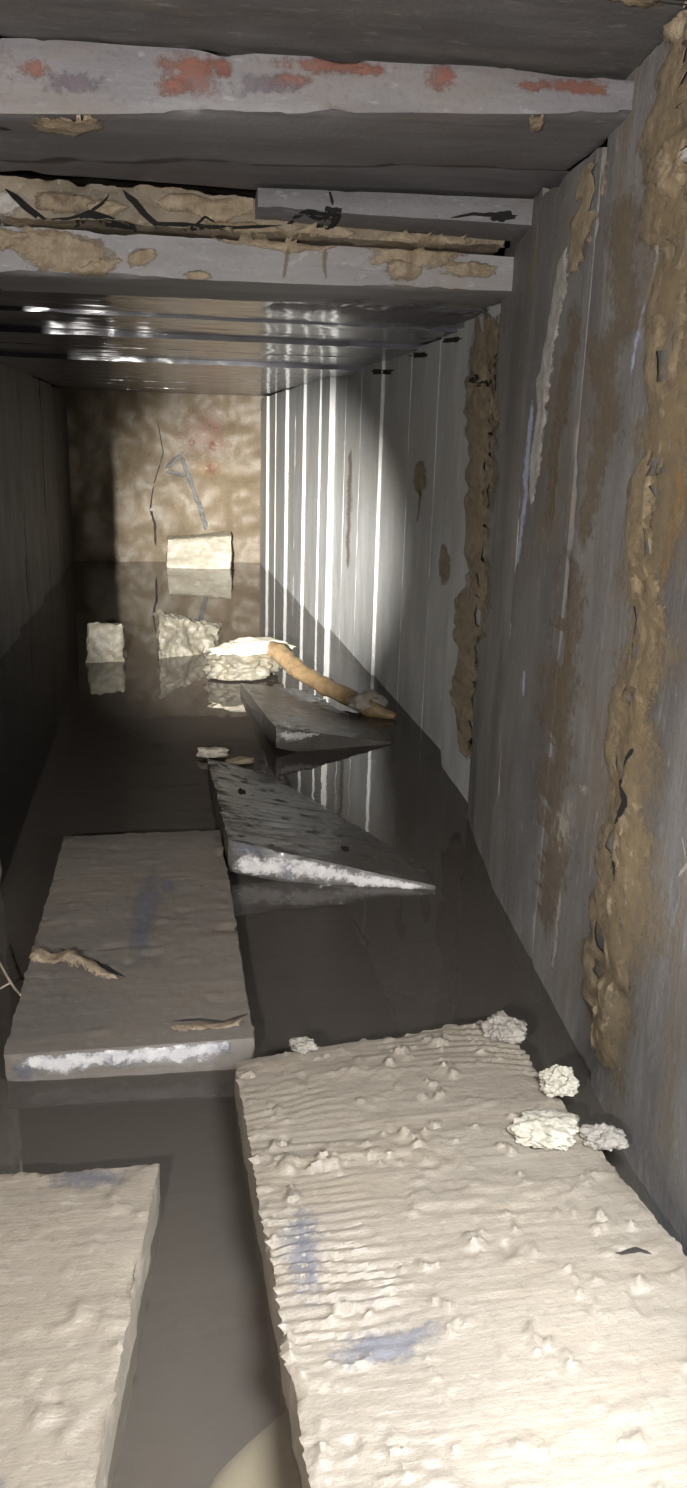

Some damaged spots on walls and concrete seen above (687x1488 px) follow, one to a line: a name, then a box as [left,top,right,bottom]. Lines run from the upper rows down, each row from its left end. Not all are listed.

peeling [611,0,687,45]
corrosion [20,60,103,92]
corrosion [158,57,231,96]
corrosion [274,57,382,86]
corrosion [519,79,607,96]
peeling [651,123,687,197]
spalling [0,191,129,225]
spalling [158,193,253,224]
spalling [287,192,342,230]
peeling [605,814,623,918]
peeling [589,969,619,1047]